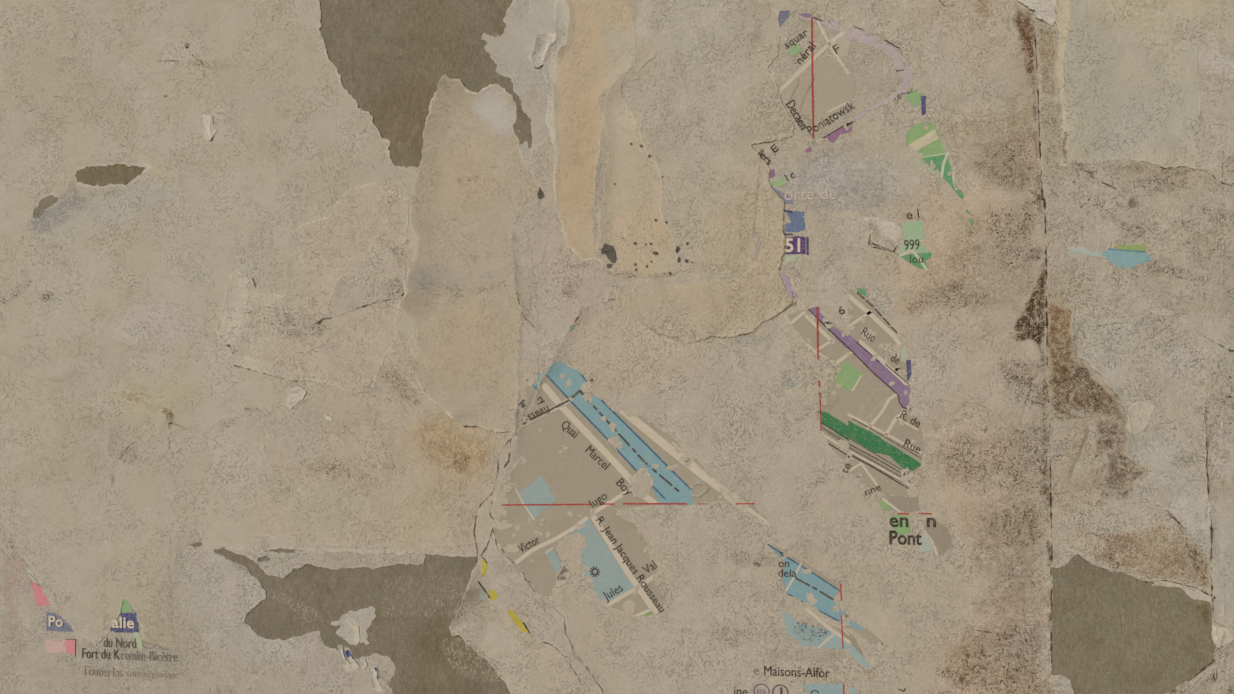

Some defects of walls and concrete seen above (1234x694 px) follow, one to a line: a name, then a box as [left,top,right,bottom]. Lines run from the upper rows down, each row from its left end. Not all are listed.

peeling [33,195,59,218]
peeling [75,164,145,186]
peeling [214,0,545,432]
crack [1035,39,1048,365]
peeling [214,547,510,694]
crack [1032,467,1053,668]
peeling [1050,554,1234,694]